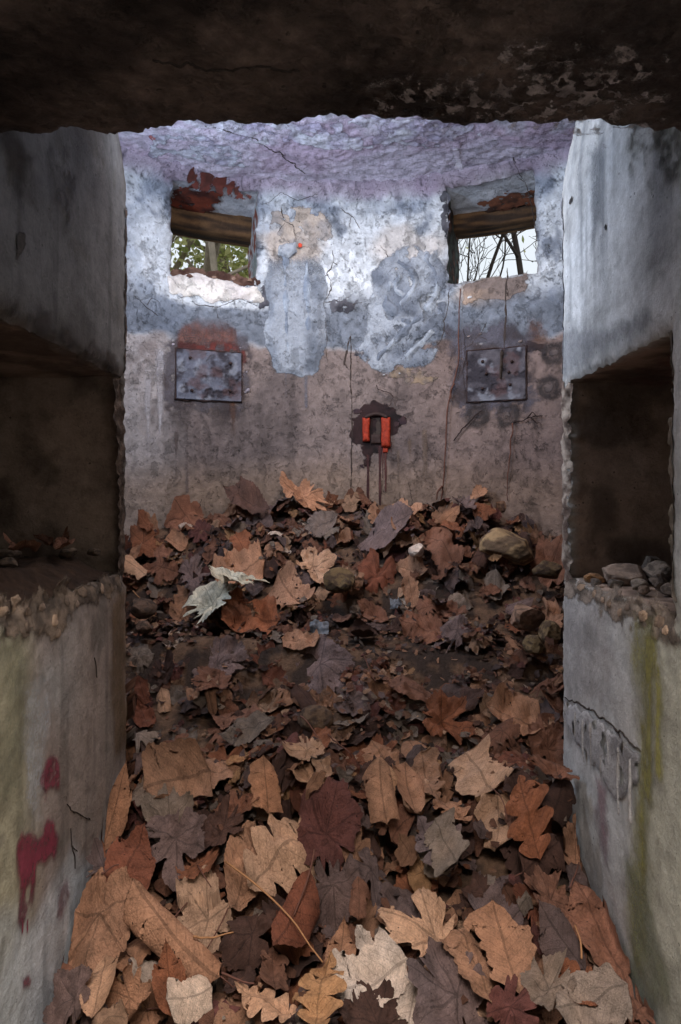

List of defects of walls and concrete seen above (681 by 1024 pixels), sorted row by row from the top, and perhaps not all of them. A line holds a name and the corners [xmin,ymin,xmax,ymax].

crack [152,59,300,73]
corrosion [171,167,252,213]
crack [205,126,318,234]
corrosion [477,190,535,213]
flaking render [270,206,333,249]
flaking render [167,267,270,309]
flaking render [330,299,357,314]
flaking render [463,272,528,305]
flaking render [161,333,252,416]
spalling [0,208,128,641]
crack [564,697,641,752]
water stain [641,638,662,800]